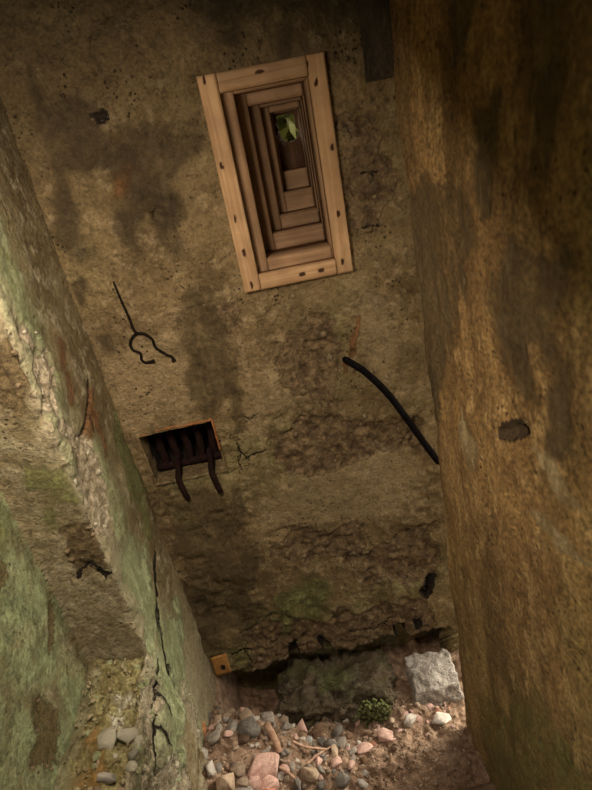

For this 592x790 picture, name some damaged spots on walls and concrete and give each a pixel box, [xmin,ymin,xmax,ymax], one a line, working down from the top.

rust [140,418,221,450]
crack [76,561,112,579]
crack [151,551,175,769]